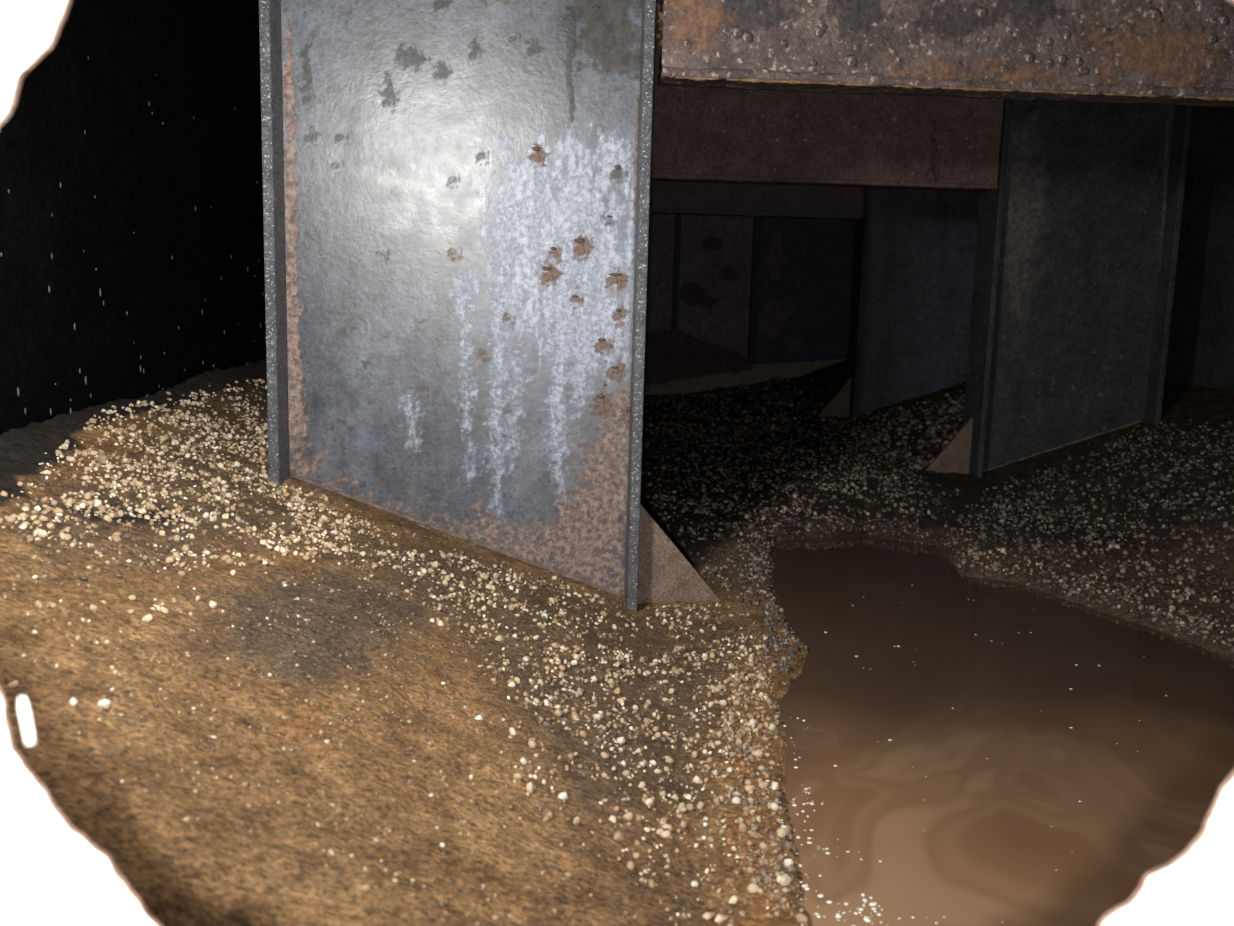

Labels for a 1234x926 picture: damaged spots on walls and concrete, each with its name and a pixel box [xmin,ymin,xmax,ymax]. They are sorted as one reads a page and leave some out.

water stain [299,45,316,109]
water stain [379,43,452,111]
rust [730,8,753,44]
rust [1183,15,1234,101]
rust [282,23,373,499]
water stain [448,0,642,524]
water stain [400,395,421,445]
rust [384,329,752,594]